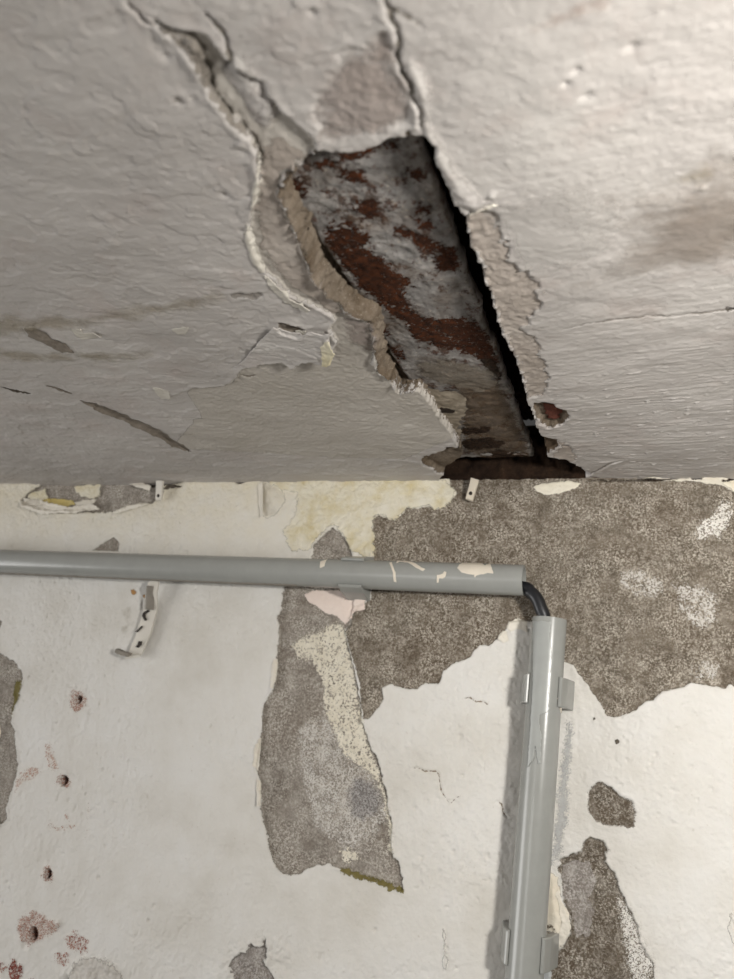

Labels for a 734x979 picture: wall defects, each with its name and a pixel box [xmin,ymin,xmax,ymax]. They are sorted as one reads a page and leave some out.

crack [130,5,262,165]
crack [384,0,419,107]
corrosion [293,176,310,199]
flaking render [80,31,734,717]
corrosion [313,137,528,458]
crack [596,307,734,323]
flaking render [20,483,164,515]
flaking render [0,653,23,825]
flaking render [252,586,537,894]
flaking render [587,782,636,828]
flaking render [229,940,274,979]
flaking render [544,837,657,979]